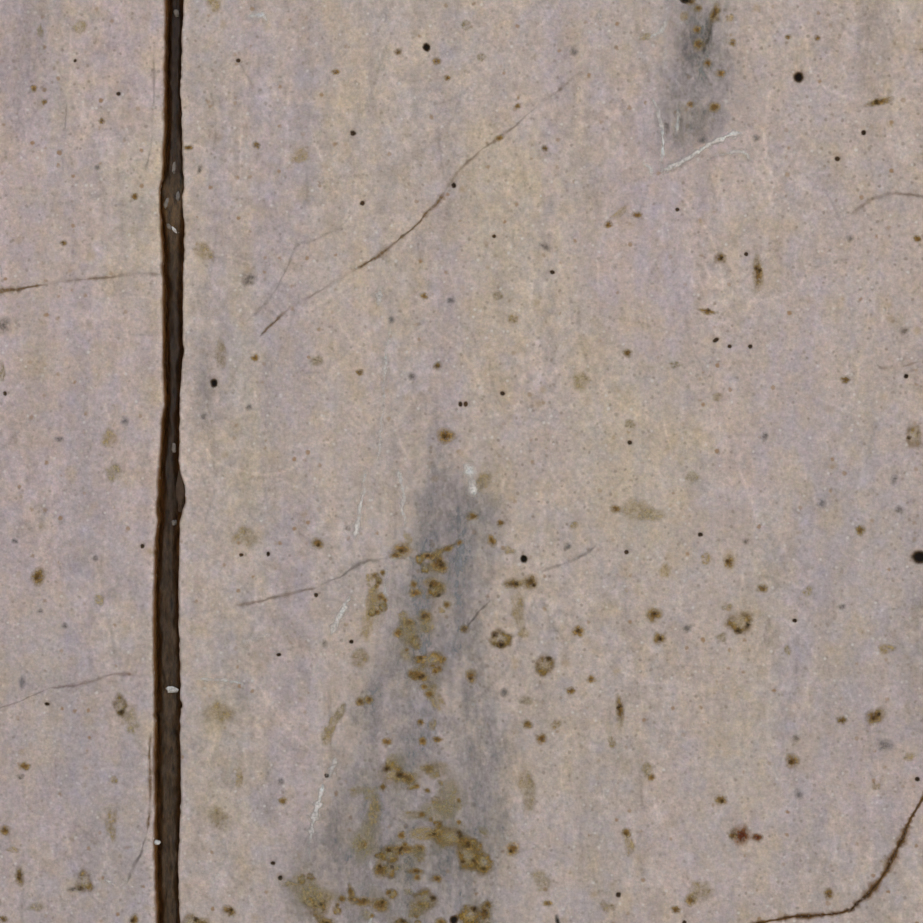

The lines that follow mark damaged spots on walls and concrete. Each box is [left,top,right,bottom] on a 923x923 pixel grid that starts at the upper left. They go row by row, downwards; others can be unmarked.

leakage [681,0,725,82]
crack [359,195,443,268]
crack [756,795,923,923]